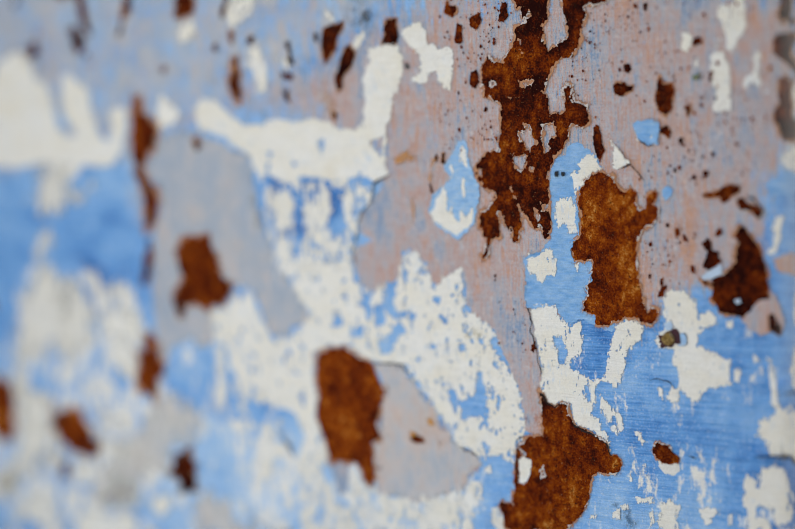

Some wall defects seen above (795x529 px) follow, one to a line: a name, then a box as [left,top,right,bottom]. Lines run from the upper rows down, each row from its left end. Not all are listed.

peeling [0,51,126,218]
rust [129,94,162,285]
rust [304,21,356,94]
rust [429,0,771,328]
rust [172,233,234,319]
peeling [147,18,643,529]
peeling [654,215,795,403]
rust [315,345,387,488]
rust [498,387,623,529]
peeling [612,496,681,529]
peeling [658,460,680,476]
peeling [742,354,795,529]